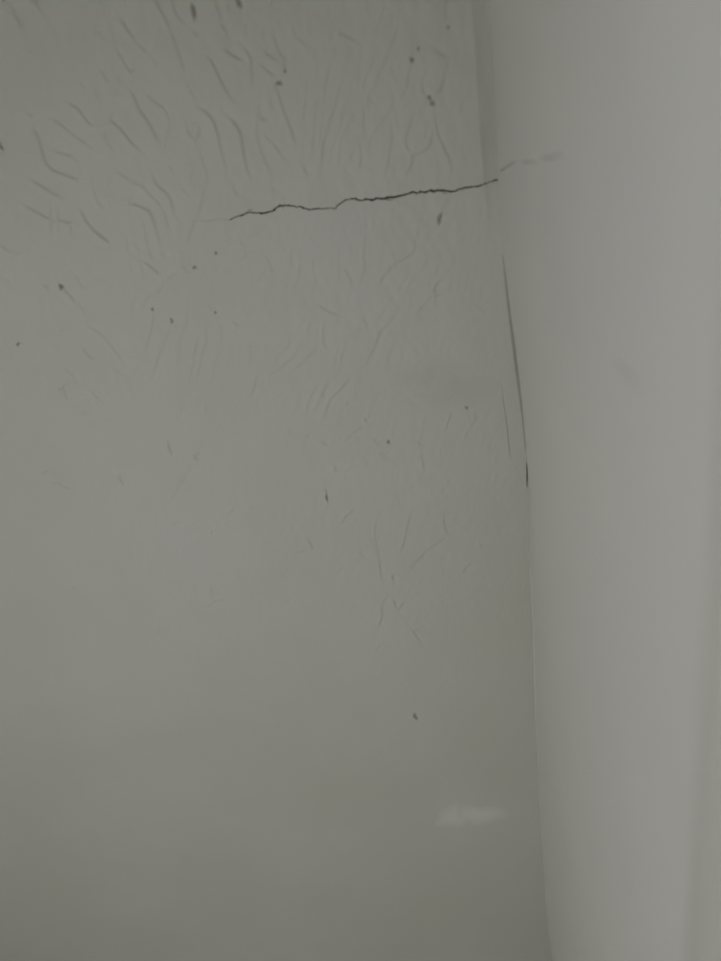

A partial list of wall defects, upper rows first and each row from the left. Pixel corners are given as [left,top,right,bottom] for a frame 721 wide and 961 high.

crack [196,179,498,221]